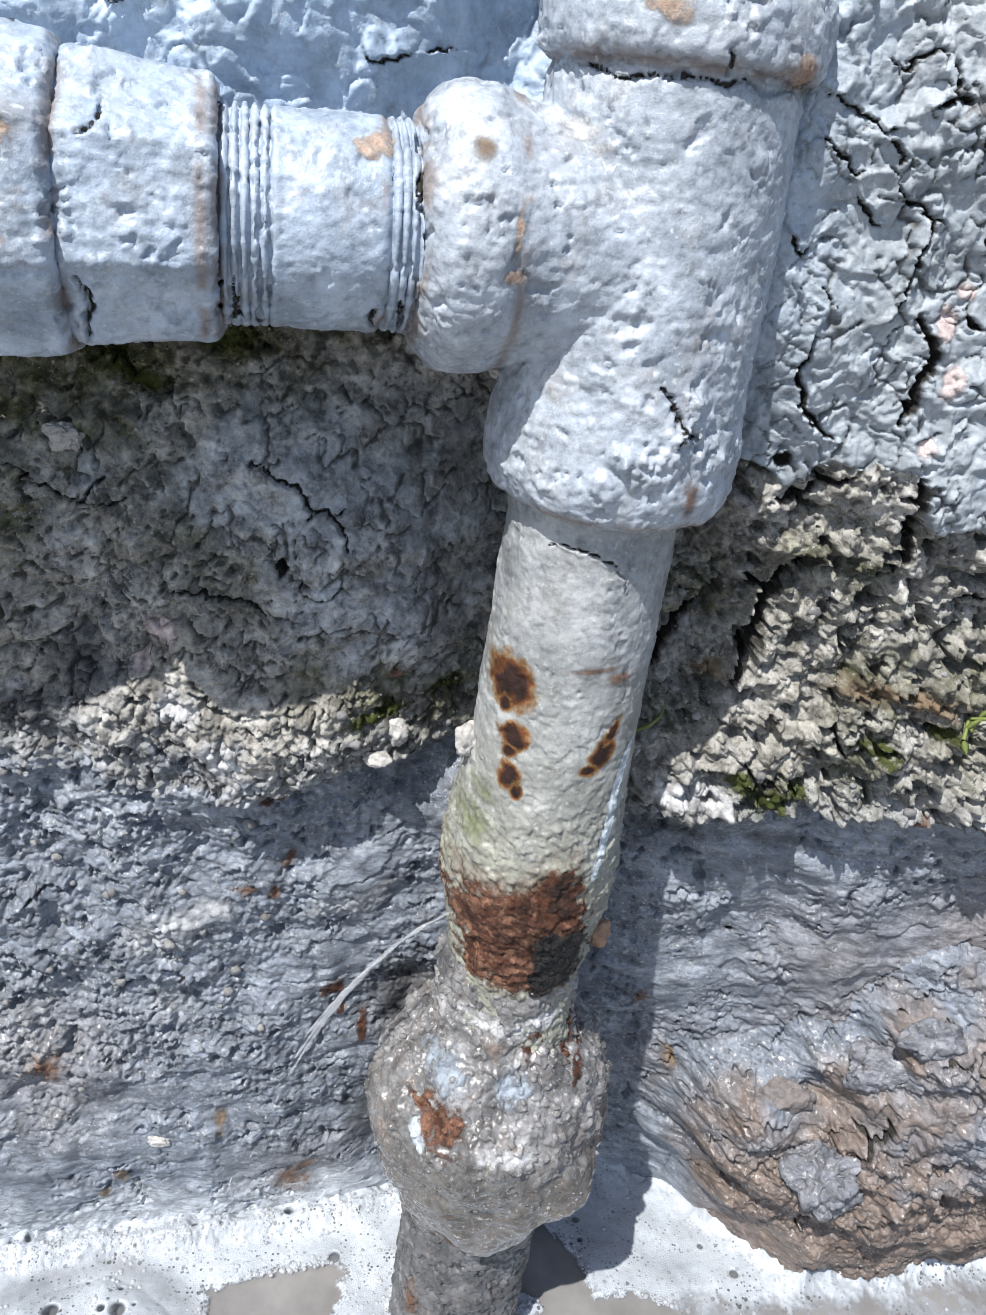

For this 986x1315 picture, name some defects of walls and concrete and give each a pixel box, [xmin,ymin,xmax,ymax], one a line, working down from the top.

crack [891,47,974,108]
crack [824,94,942,426]
crack [794,340,834,440]
crack [889,479,929,573]
peeling [130,614,177,677]
crack [729,557,802,686]
peeling [144,688,278,795]
rust [490,648,537,800]
rust [579,715,622,778]
peeling [646,776,737,825]
rust [439,842,593,995]
rust [407,1086,465,1165]